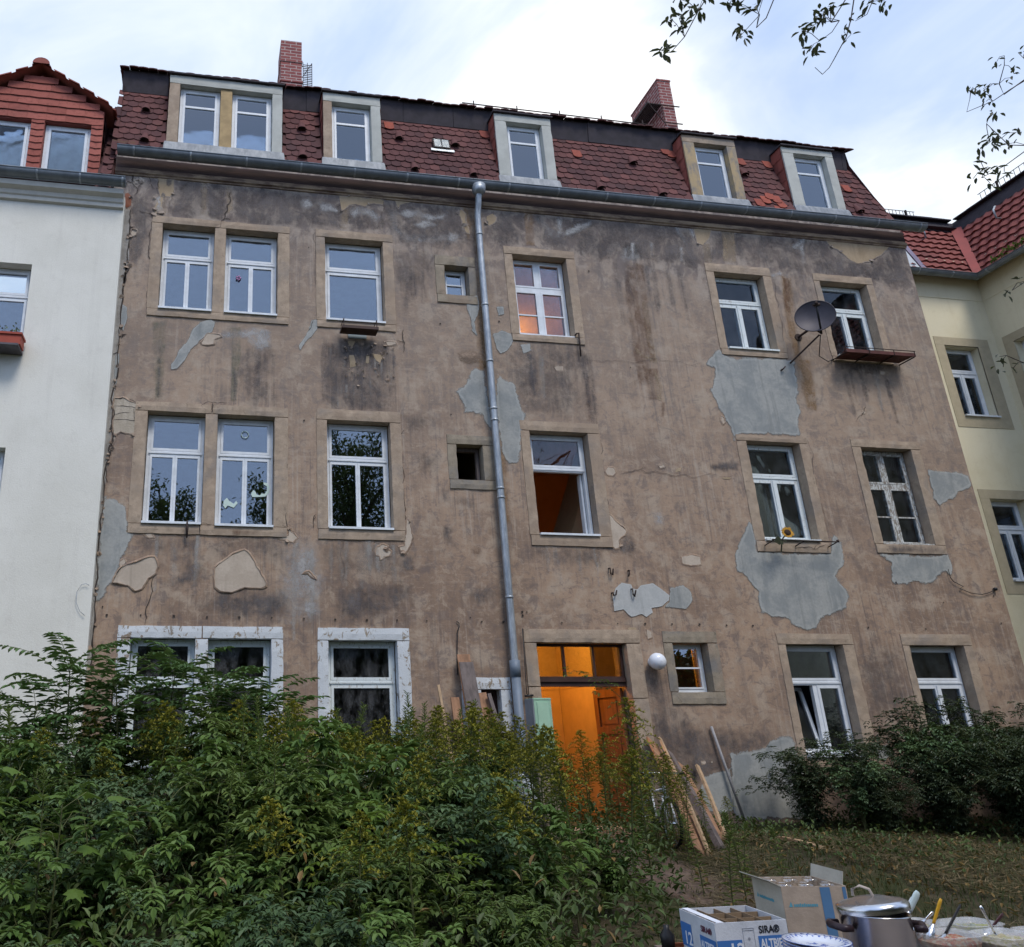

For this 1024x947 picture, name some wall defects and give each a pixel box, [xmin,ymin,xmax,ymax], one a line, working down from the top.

flaking render [825,241,891,265]
crack [105,398,135,482]
flaking render [87,176,176,666]